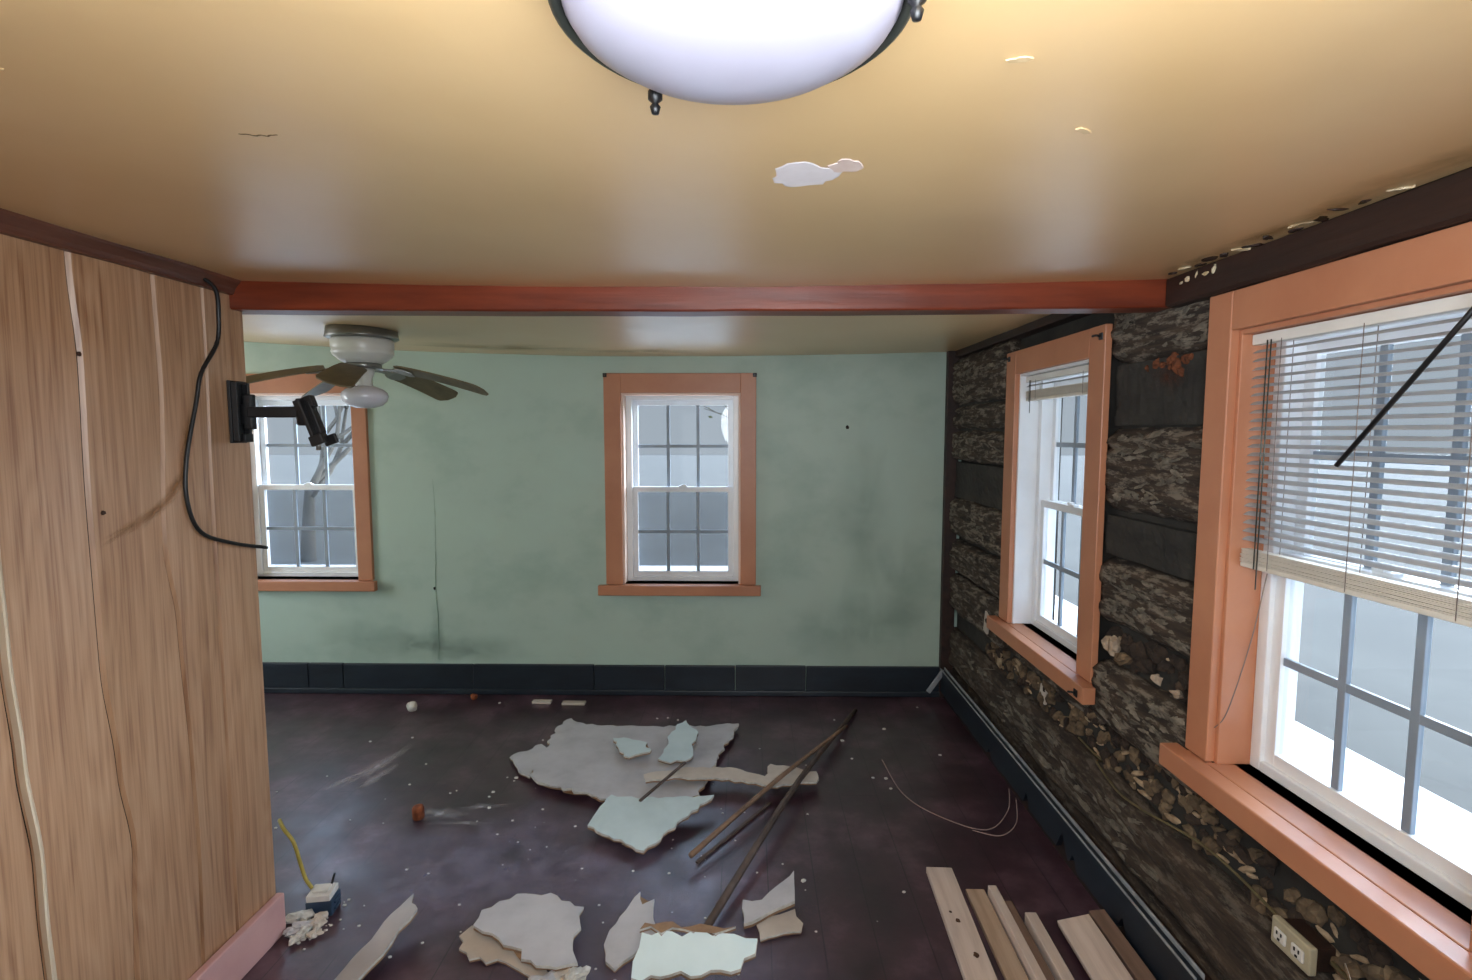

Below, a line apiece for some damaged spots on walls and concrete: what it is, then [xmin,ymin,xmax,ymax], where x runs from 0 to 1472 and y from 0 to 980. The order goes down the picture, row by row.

peeling [772,158,864,187]
peeling [1095,670,1185,764]
peeling [955,647,1159,882]